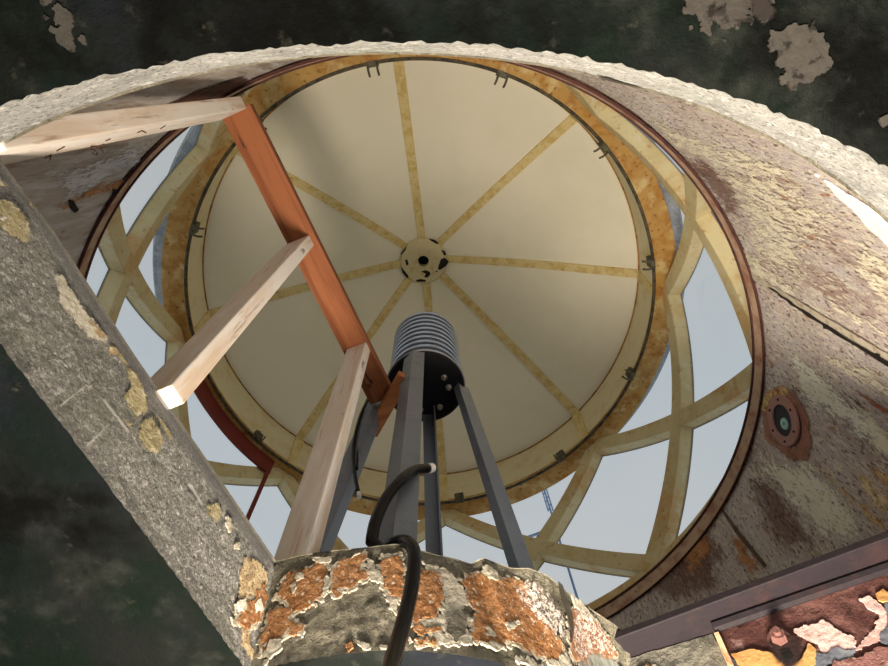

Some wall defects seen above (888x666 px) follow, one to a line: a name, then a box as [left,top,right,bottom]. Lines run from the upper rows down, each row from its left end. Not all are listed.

peeling [40,0,88,53]
peeling [682,0,833,91]
spalling [0,199,33,243]
spalling [53,274,173,454]
crack [751,273,888,367]
rust [760,385,888,530]
spalling [206,503,234,533]
peeling [230,542,407,666]
peeling [408,560,619,666]
peeling [730,649,782,666]
peeling [794,589,888,666]